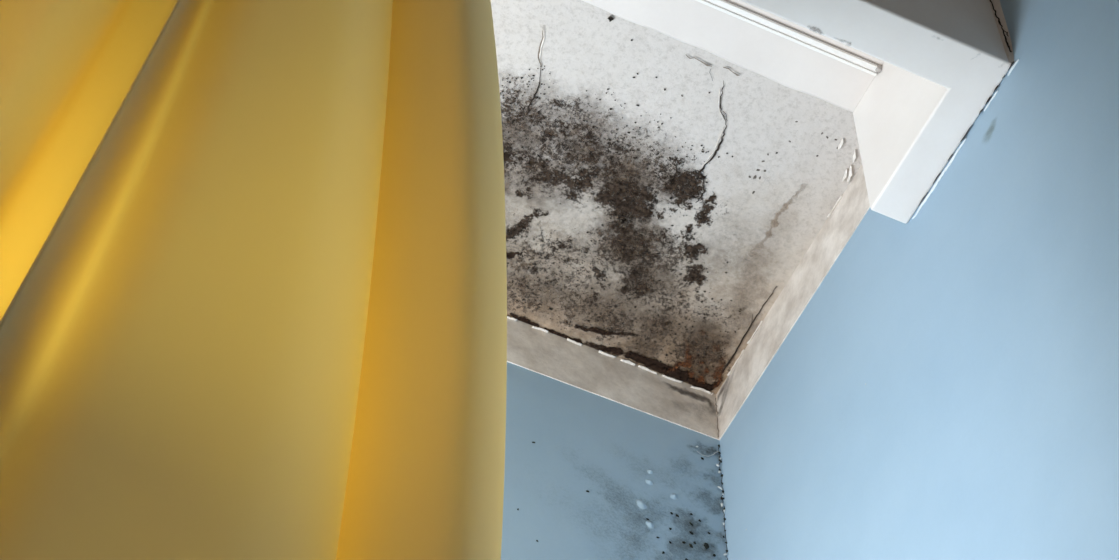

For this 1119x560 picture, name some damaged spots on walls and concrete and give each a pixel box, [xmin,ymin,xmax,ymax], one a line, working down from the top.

crack [526,27,545,115]
crack [664,55,740,203]
crack [919,0,1014,205]
water stain [500,66,742,407]
water stain [657,512,725,560]